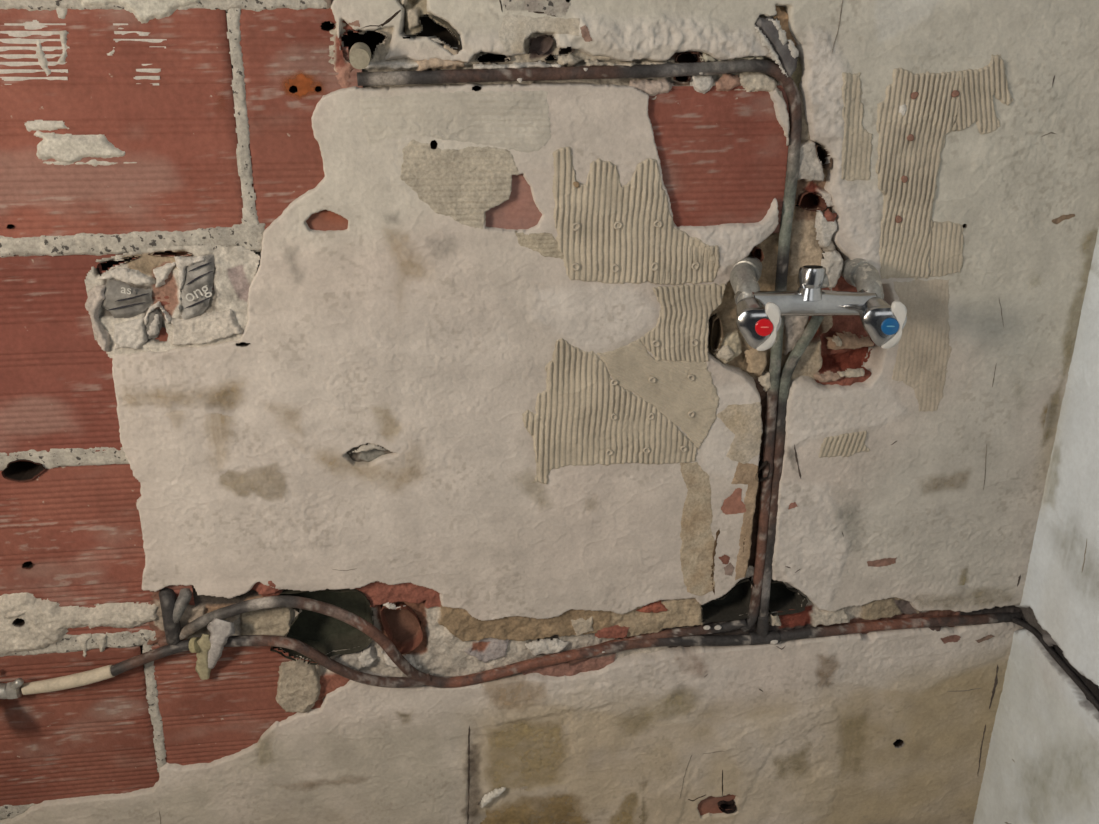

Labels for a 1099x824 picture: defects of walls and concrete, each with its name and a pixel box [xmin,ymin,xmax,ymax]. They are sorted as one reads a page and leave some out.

flaking render [485,174,542,230]
flaking render [629,72,790,233]
flaking render [0,0,363,608]
spalling [636,600,668,613]
flaking render [0,623,319,819]